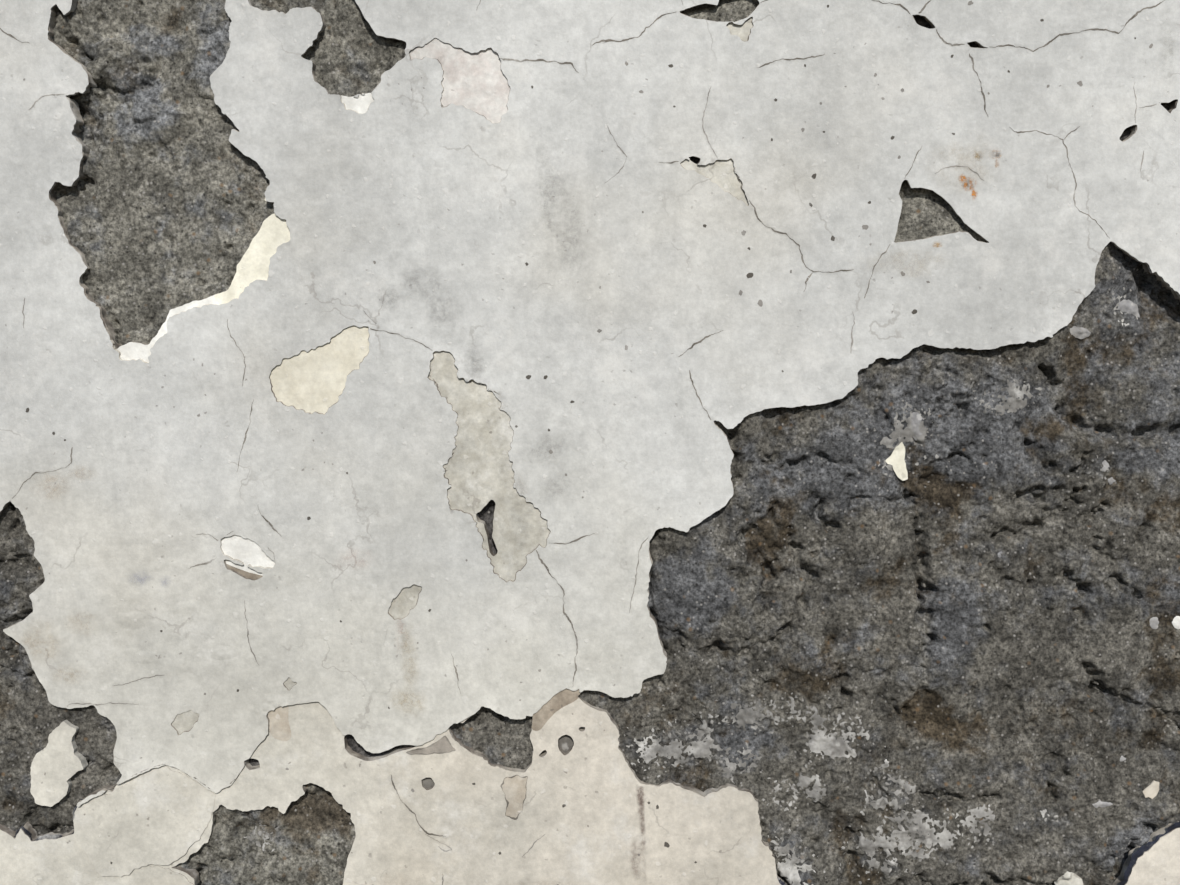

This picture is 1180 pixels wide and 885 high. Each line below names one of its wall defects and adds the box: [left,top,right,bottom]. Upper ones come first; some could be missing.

spalling [248,0,510,123]
crack [498,0,683,73]
crack [759,55,822,68]
crack [873,0,1163,114]
spalling [48,0,290,363]
crack [702,88,890,351]
spalling [894,180,989,243]
crack [905,147,984,181]
crack [1013,126,1107,235]
spalling [344,242,1180,885]
spalling [0,501,122,841]
spalling [172,783,356,885]